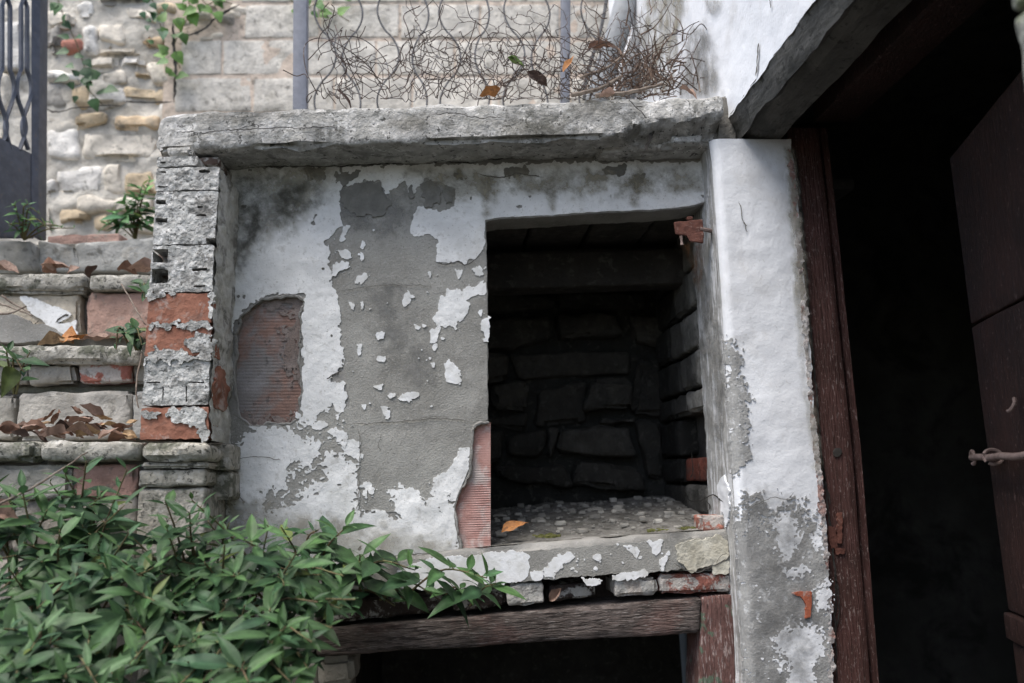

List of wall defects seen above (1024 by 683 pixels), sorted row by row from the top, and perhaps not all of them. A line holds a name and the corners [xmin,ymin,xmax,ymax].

peeling [211,149,836,683]